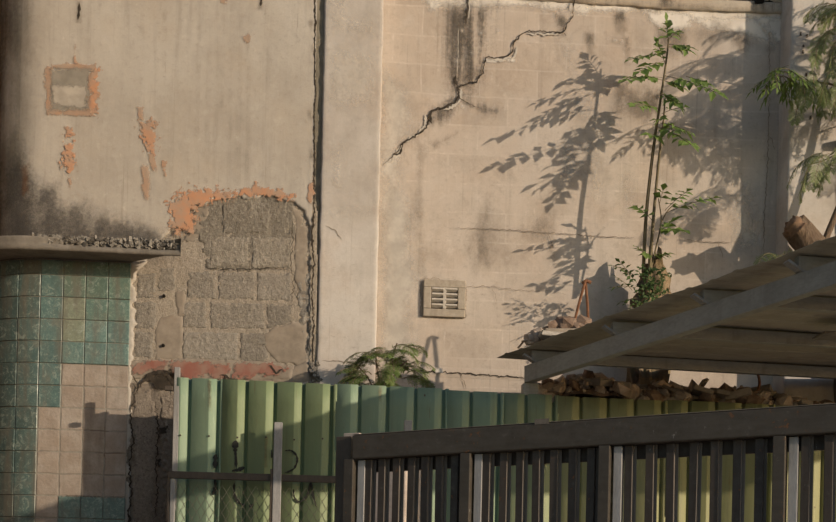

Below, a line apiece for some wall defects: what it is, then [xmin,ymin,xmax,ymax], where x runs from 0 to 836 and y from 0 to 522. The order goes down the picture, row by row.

water stain [0,0,20,106]
peeling [43,55,101,117]
crack [383,0,575,172]
water stain [427,0,781,81]
peeling [59,126,77,185]
water stain [0,137,156,240]
peeling [137,107,167,176]
spalling [31,181,323,522]